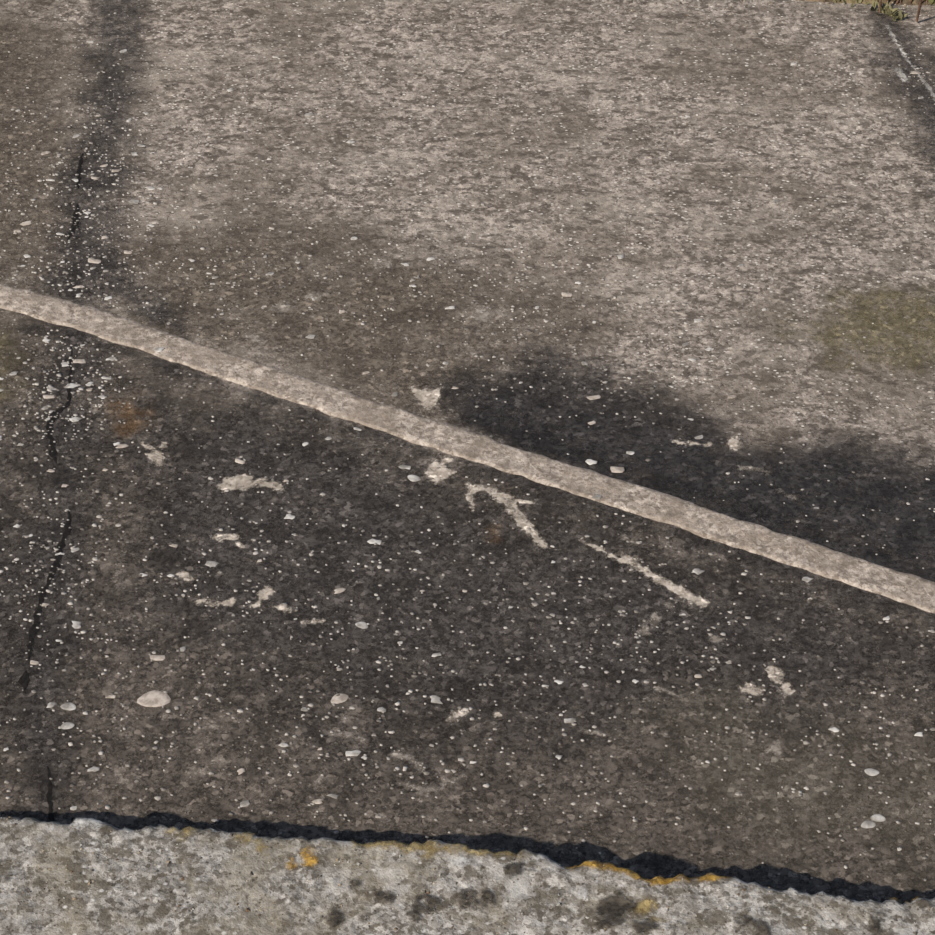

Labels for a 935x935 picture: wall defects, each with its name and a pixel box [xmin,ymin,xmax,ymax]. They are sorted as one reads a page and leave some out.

crack [67,153,83,240]
crack [46,346,73,463]
crack [18,510,71,690]
crack [46,766,55,822]